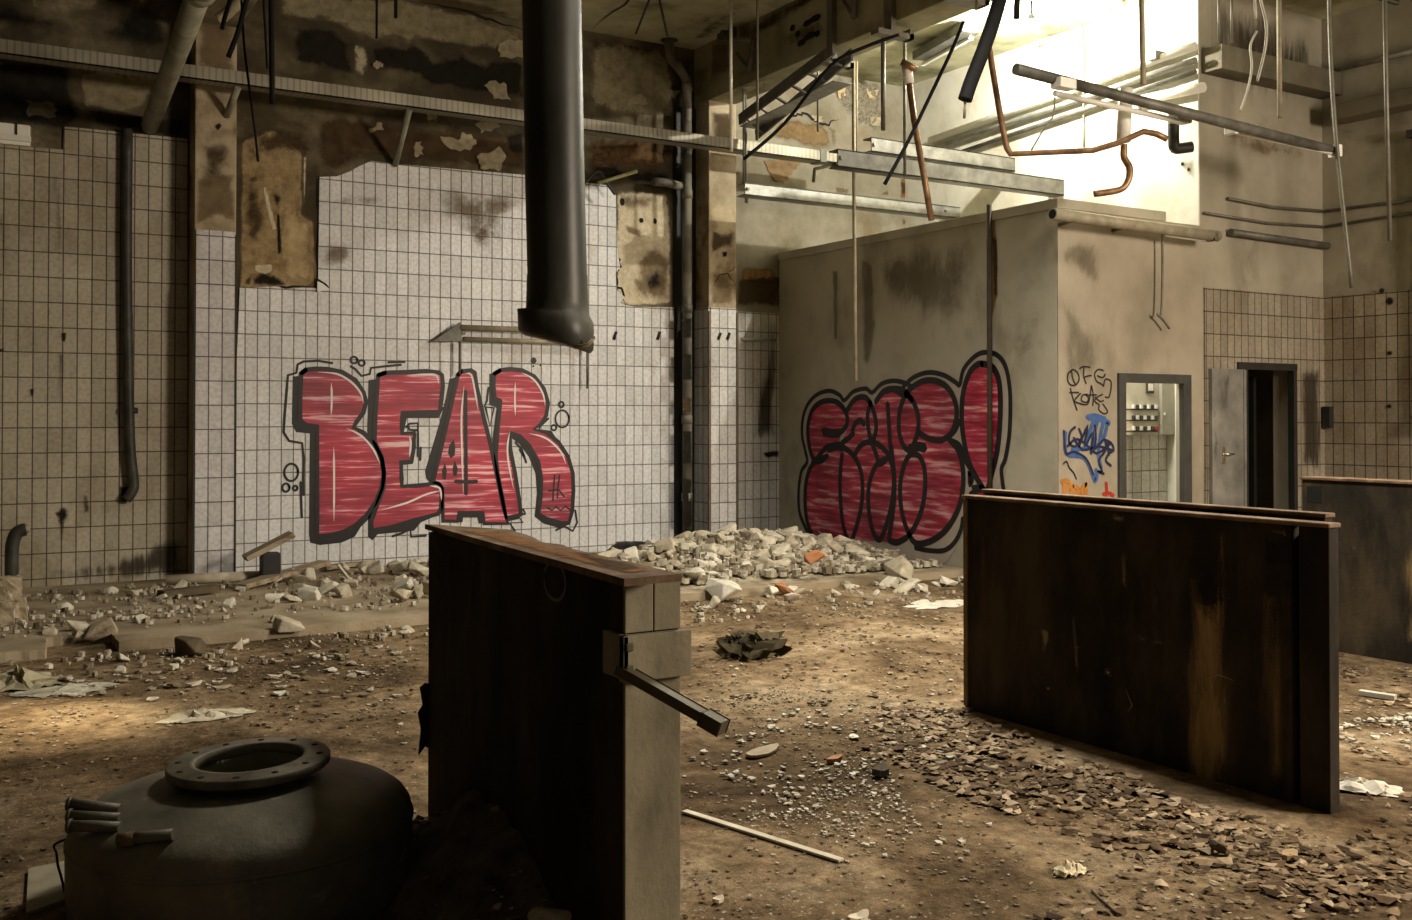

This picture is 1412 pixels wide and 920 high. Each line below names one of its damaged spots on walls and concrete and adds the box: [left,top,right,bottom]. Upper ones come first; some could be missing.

peeling [81,71,156,111]
peeling [240,114,523,292]
peeling [616,193,670,305]
water stain [863,262,874,361]